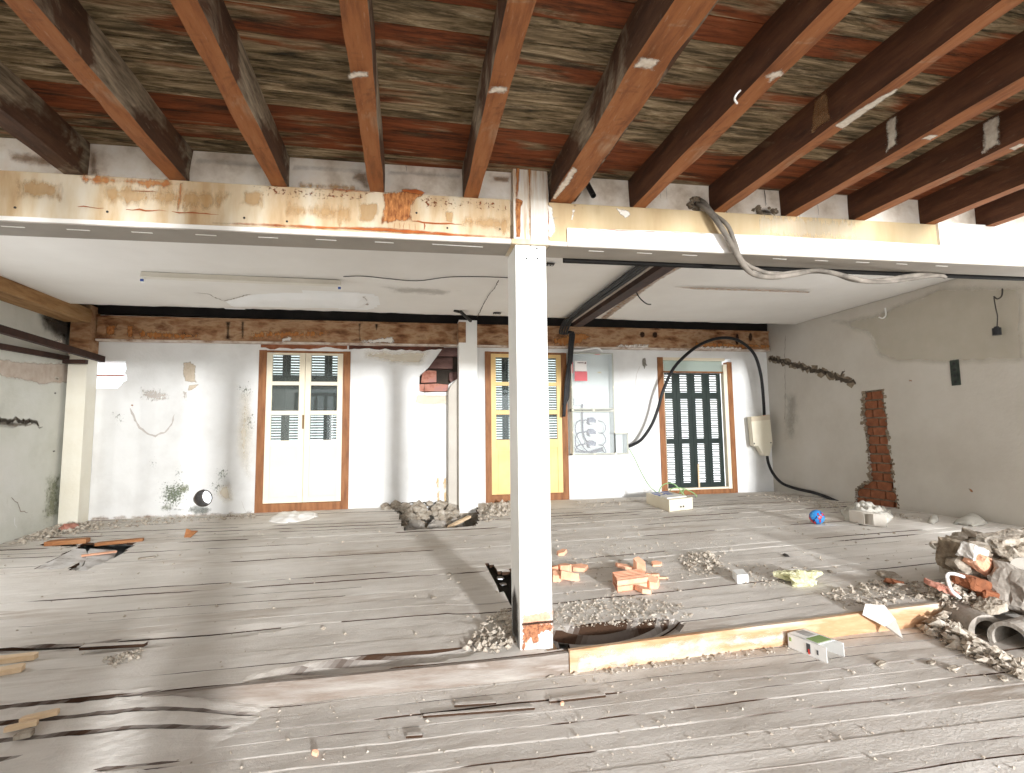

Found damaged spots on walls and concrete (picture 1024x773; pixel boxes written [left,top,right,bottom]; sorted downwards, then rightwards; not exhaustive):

rust [83,175,218,215]
rust [254,168,531,237]
peeling [0,360,68,384]
peeling [183,362,197,390]
spalling [261,337,458,405]
spalling [854,389,900,509]
damp [163,474,208,516]
rust [512,589,554,650]